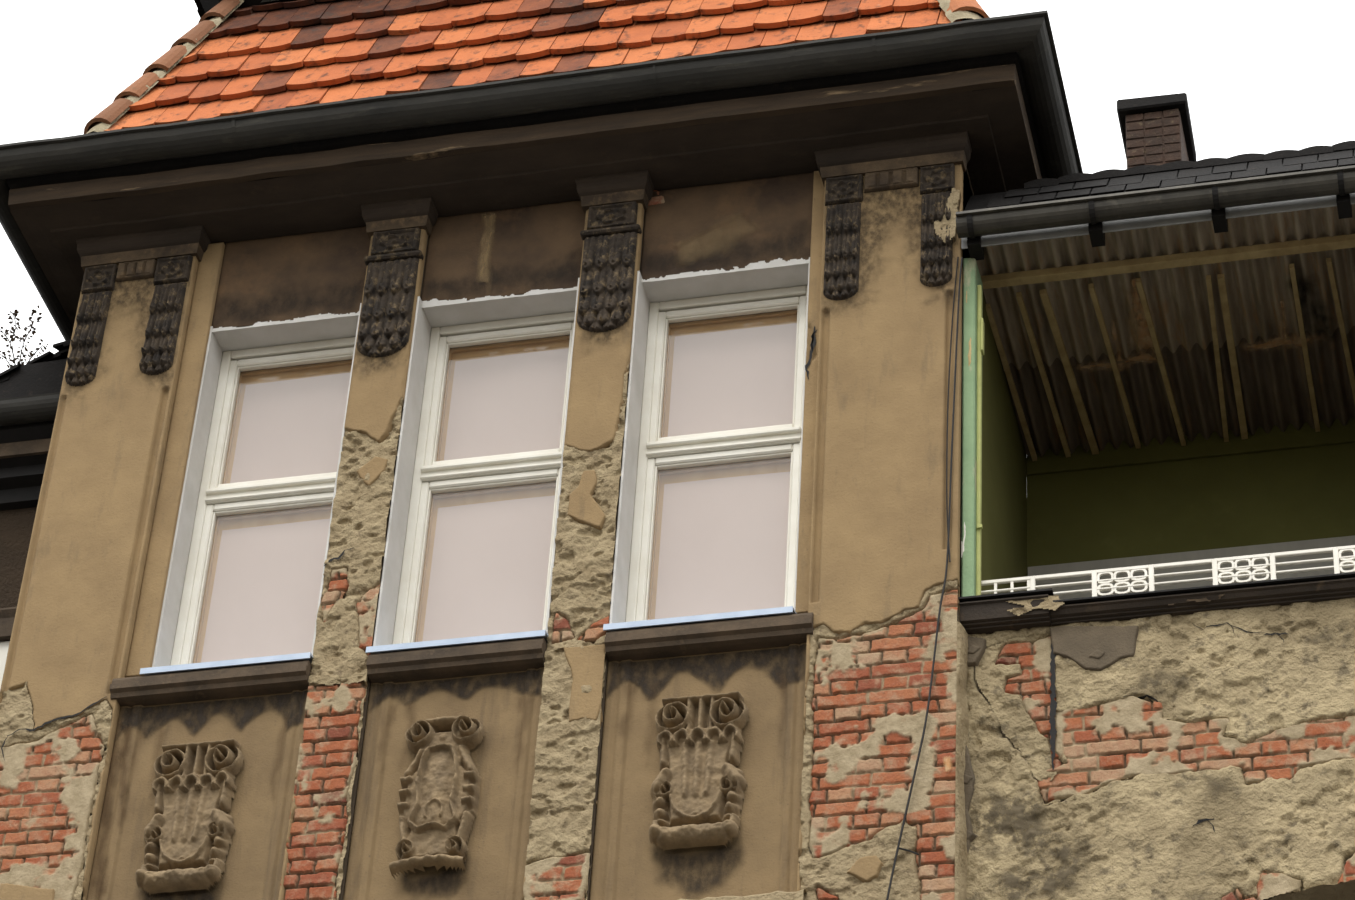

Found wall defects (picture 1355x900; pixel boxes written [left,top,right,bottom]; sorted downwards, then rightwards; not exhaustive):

flaking render [0,682,113,900]
flaking render [280,397,403,900]
spalling [523,364,629,900]
flaking render [799,580,1355,900]